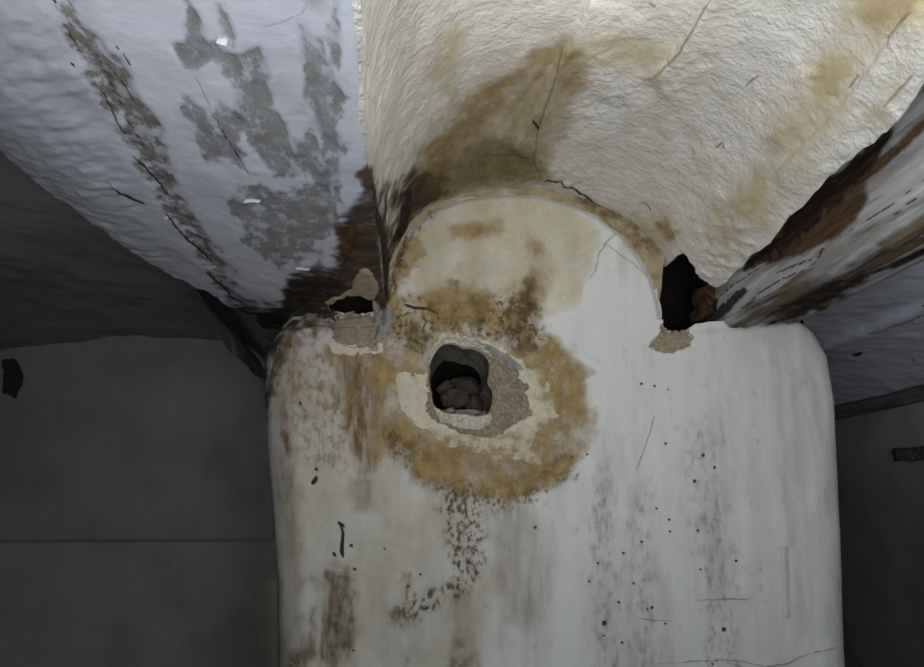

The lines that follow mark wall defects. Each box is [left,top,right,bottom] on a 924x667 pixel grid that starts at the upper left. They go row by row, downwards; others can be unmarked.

peeling [53,0,237,300]
peeling [174,5,347,271]
spalling [325,268,395,356]
damp [229,50,587,618]
spalling [396,333,566,470]
spalling [649,254,716,353]